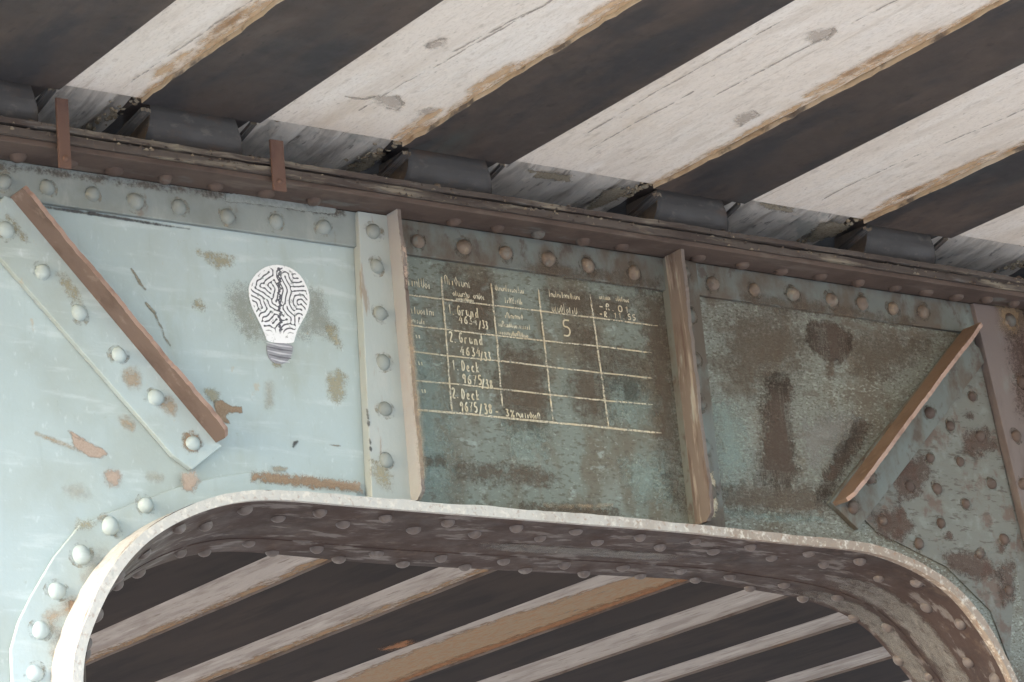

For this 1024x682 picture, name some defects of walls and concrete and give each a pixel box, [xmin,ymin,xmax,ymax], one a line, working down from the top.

peeling [205,389,242,424]
spalling [45,432,107,458]
corrosion [961,413,997,458]
corrosion [252,466,363,492]
corrosion [871,455,930,543]
corrosion [943,531,1016,607]